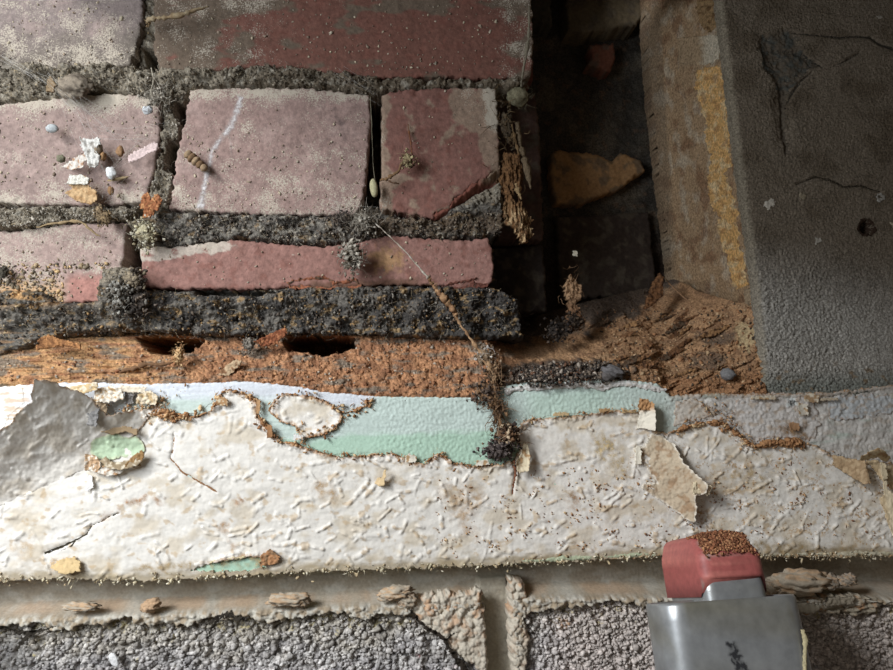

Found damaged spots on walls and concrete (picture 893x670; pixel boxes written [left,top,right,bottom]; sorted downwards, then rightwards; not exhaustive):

crack [774,33,893,102]
crack [796,176,880,192]
peeling [0,388,24,429]
peeling [84,426,145,492]
peeling [66,380,893,480]